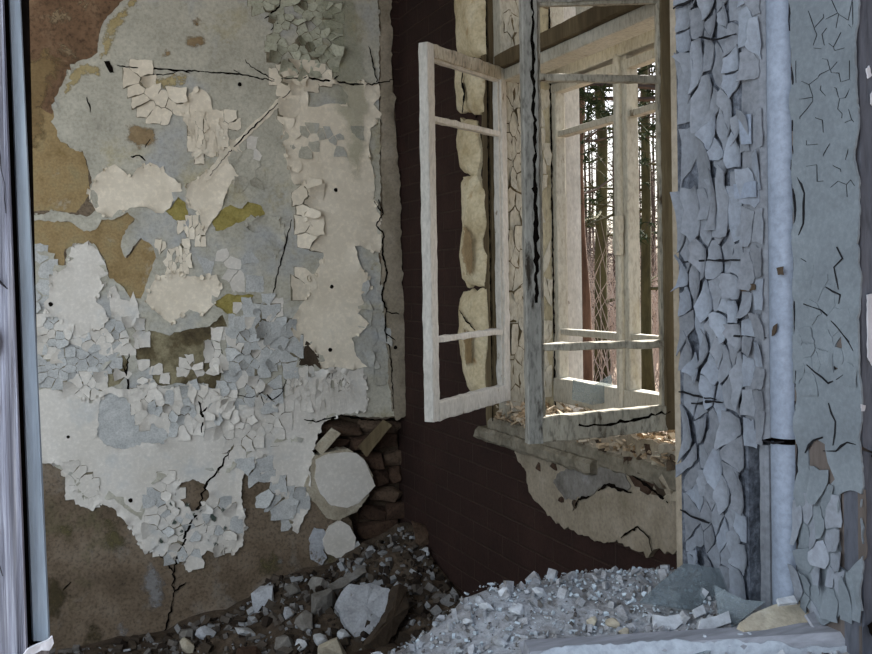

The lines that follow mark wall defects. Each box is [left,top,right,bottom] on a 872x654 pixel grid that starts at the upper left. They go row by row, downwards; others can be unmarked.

crack [117,47,394,176]
crack [788,0,855,235]
peeling [29,0,404,572]
peeling [536,0,778,607]
crack [793,247,853,351]
peeling [776,0,872,627]
crack [159,450,230,631]